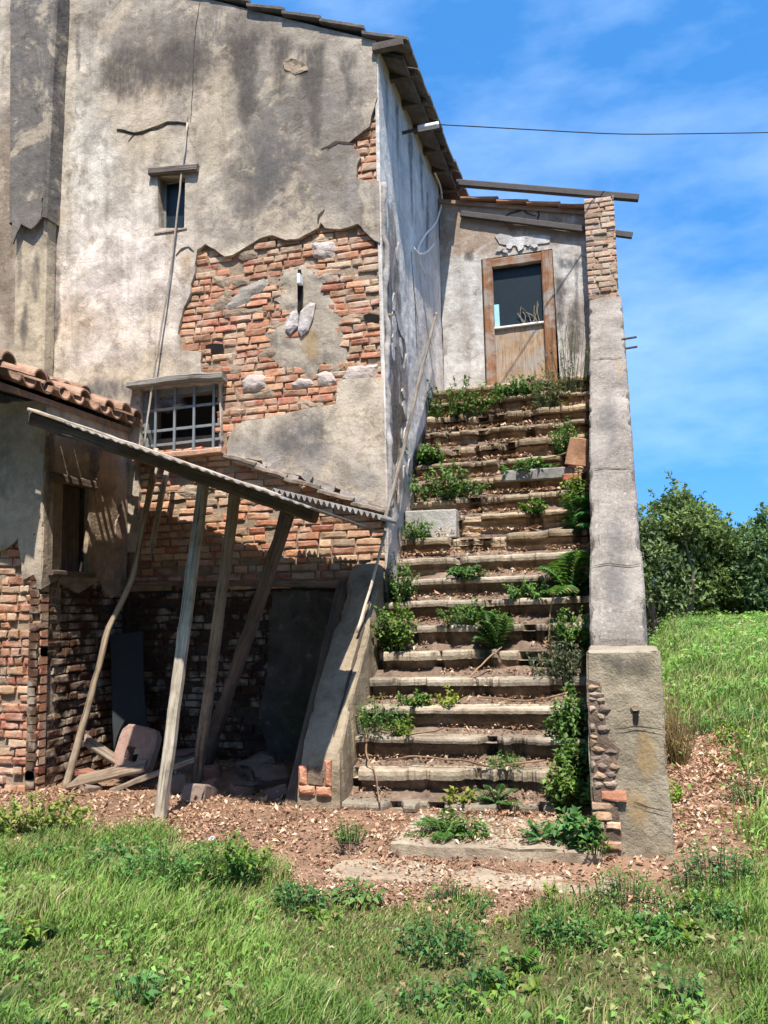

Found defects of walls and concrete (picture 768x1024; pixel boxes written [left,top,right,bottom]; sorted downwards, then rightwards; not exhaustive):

crack [116,3,200,141]
water stain [234,33,262,115]
water stain [302,43,323,92]
spalling [327,114,377,181]
flaking render [495,234,550,253]
flaking render [128,204,425,761]
flaking render [586,679,627,856]